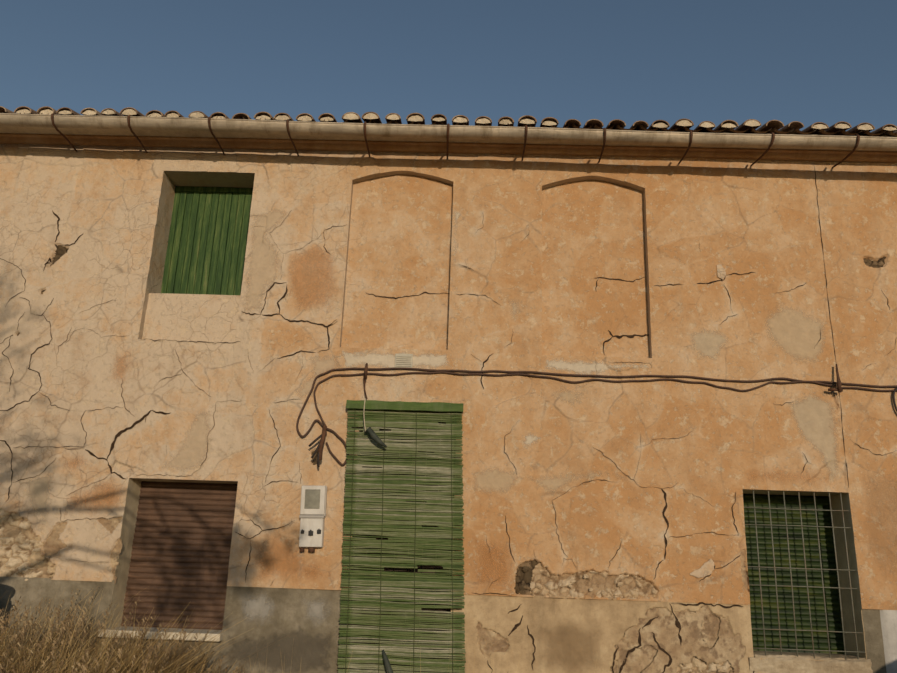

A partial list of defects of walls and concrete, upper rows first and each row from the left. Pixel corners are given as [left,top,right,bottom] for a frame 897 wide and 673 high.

spalling [50,245,69,266]
crack [369,292,500,305]
spalling [863,257,886,268]
crack [0,210,345,521]
spalling [0,509,67,589]
crack [236,519,290,583]
crack [552,431,743,673]
spalling [514,559,745,673]